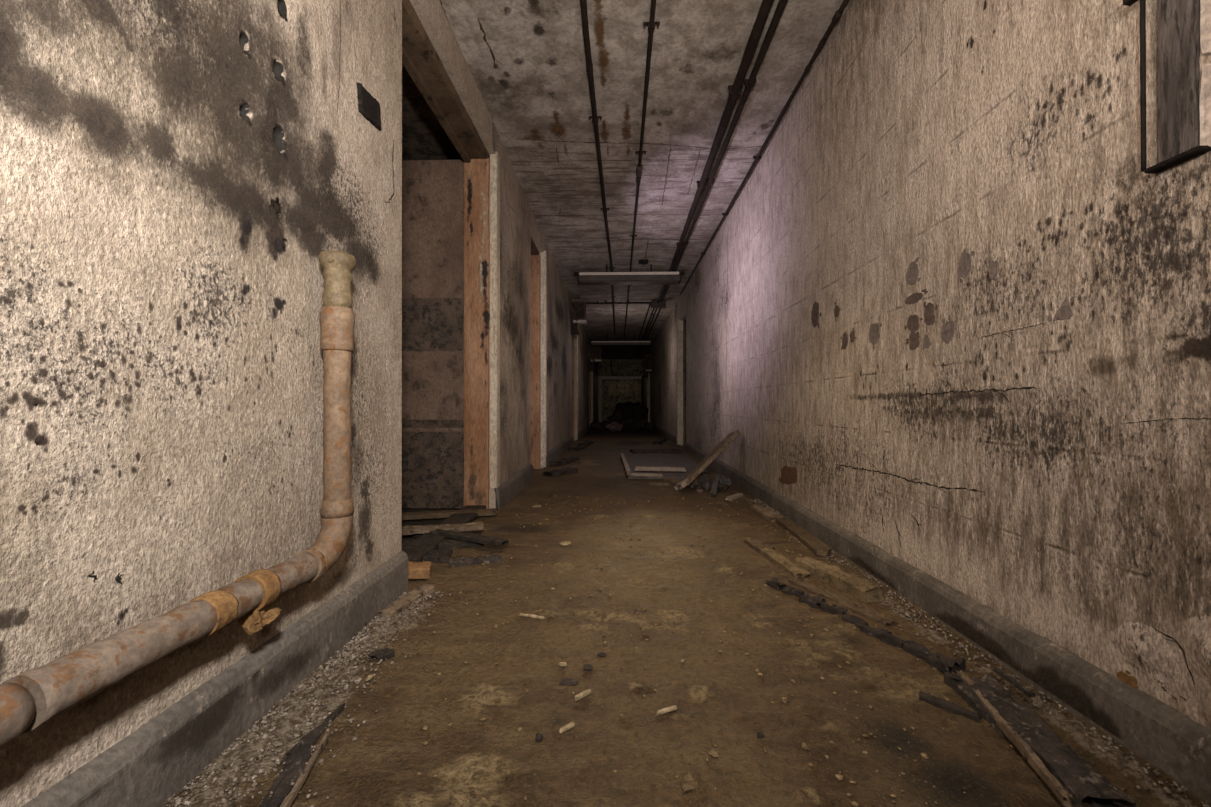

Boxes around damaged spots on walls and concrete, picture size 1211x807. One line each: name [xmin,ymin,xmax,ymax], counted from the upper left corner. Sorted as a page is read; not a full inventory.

leakage [0,0,378,283]
crack [337,0,348,112]
rust [594,0,609,86]
leakage [1037,47,1126,138]
leakage [1019,156,1188,305]
leakage [0,323,141,451]
leakage [149,302,228,404]
crack [917,387,1038,402]
crack [1123,417,1211,426]
crack [881,510,921,548]
crack [835,464,984,494]
leakage [936,615,1121,739]